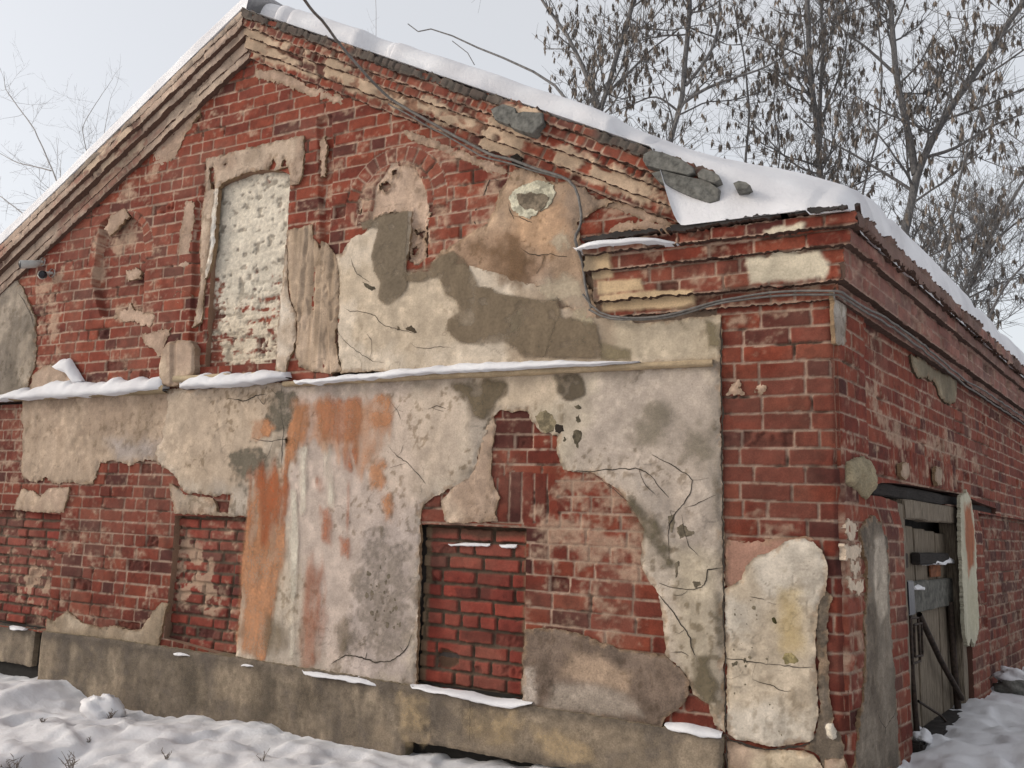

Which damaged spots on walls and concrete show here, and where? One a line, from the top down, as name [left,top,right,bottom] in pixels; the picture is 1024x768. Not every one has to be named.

flaking render [0,401,245,653]
water stain [229,448,266,492]
flaking render [18,61,566,388]
corrosion [241,394,392,662]
water stain [451,380,507,419]
water stain [361,211,630,360]
flaking render [421,405,680,667]
water stain [556,374,585,400]
flaking render [577,188,676,244]
crack [573,322,813,768]
water stain [706,321,719,347]
crack [333,635,412,663]